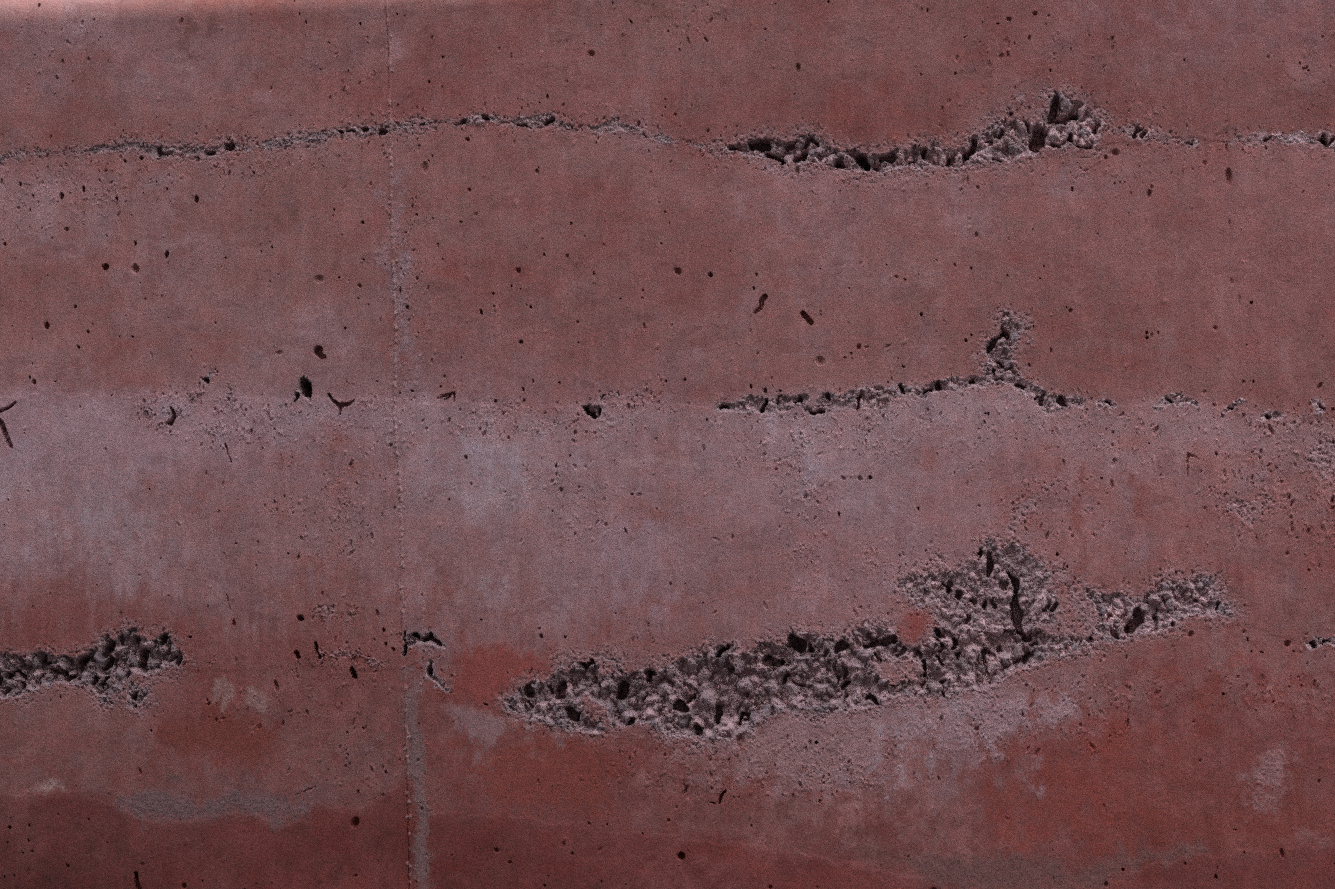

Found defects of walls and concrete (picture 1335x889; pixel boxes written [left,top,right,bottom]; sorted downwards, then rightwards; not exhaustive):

spalling [722,90,1106,174]
flaking render [984,331,1019,373]
spalling [0,626,184,709]
spalling [440,472,1235,805]